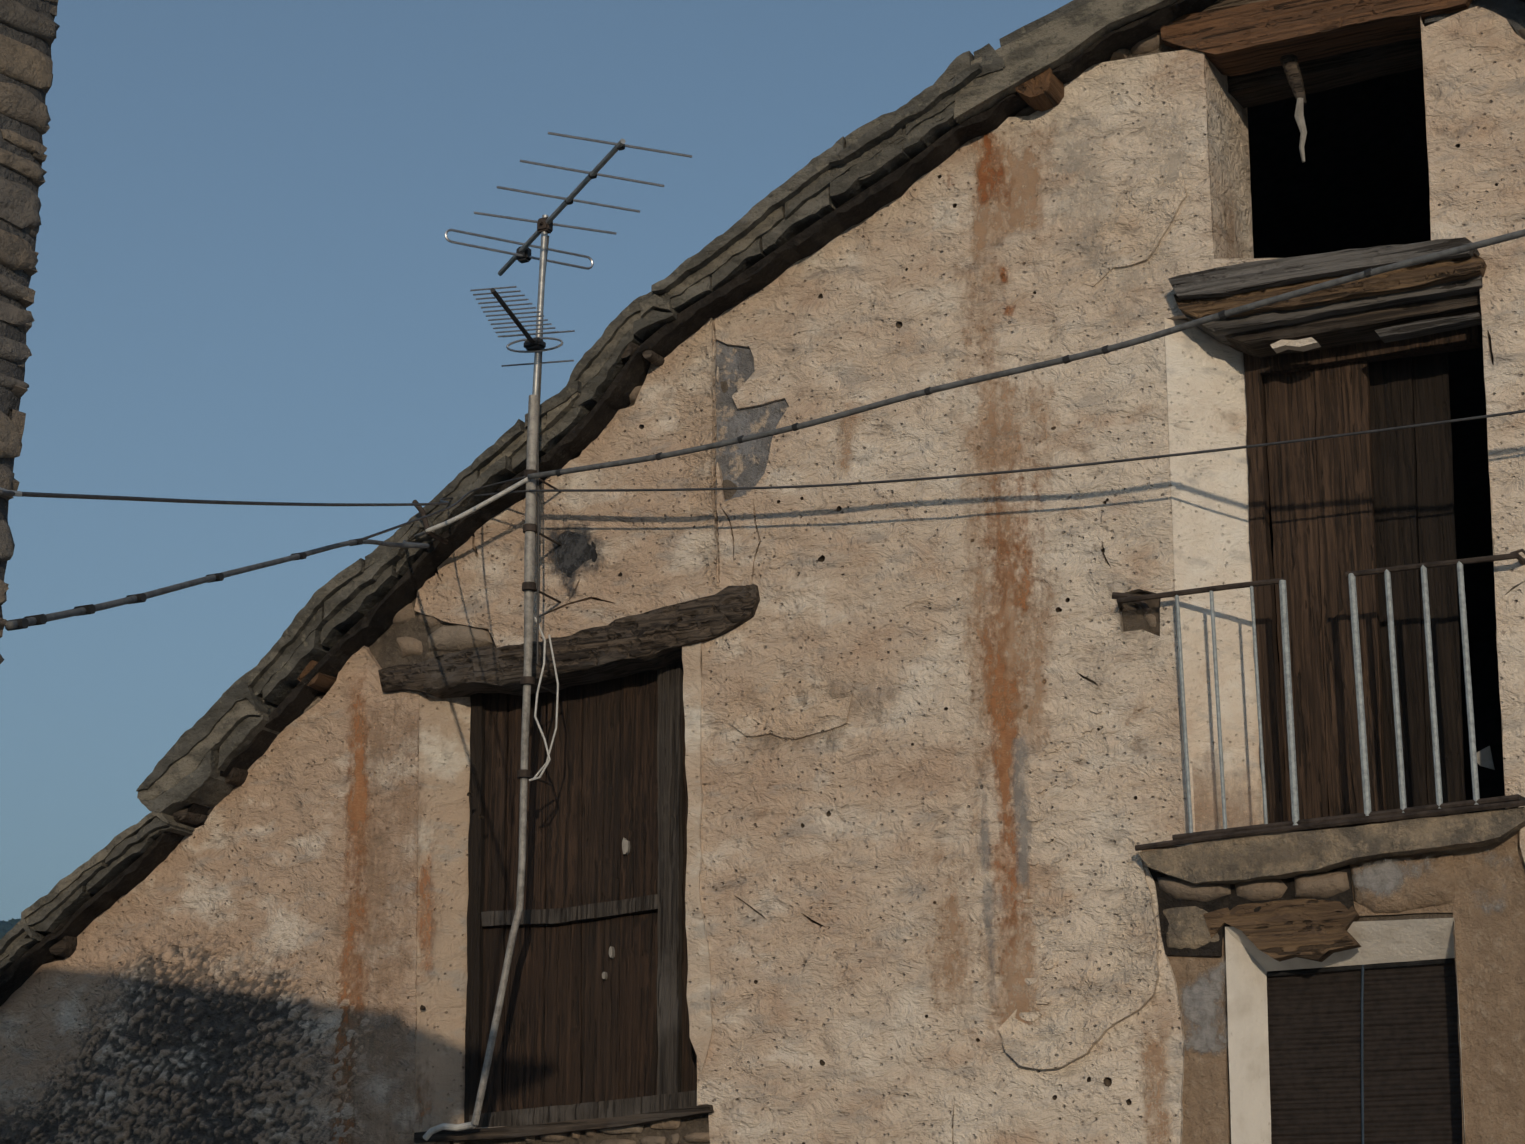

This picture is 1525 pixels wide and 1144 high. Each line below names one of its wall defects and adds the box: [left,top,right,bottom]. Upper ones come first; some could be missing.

corrosion [972,134,1051,282]
flaking render [675,318,789,586]
corrosion [346,697,369,875]
corrosion [968,380,1052,1024]
mould [0,891,385,1144]
corrosion [332,896,366,1144]
spalling [998,811,1525,1144]